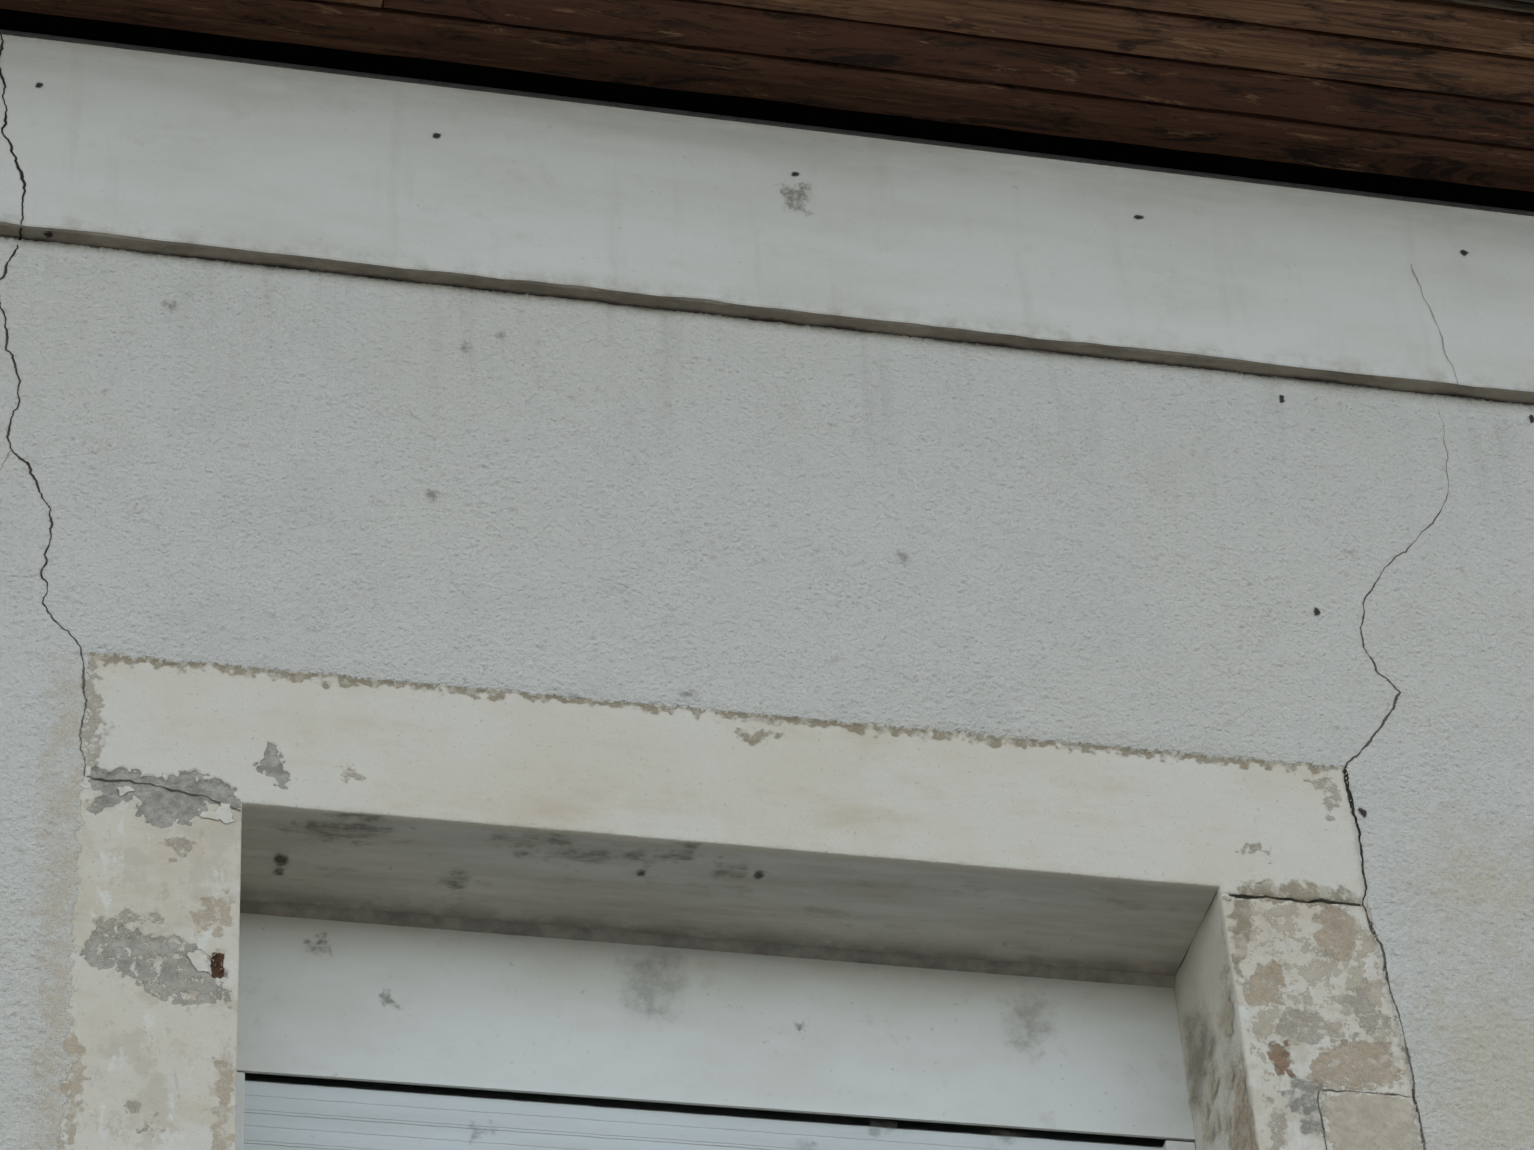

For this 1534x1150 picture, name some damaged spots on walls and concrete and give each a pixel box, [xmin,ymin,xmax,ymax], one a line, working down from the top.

crack [0,33,241,811]
spalling [80,891,235,1006]
spalling [82,661,241,828]
crack [1229,410,1449,1150]